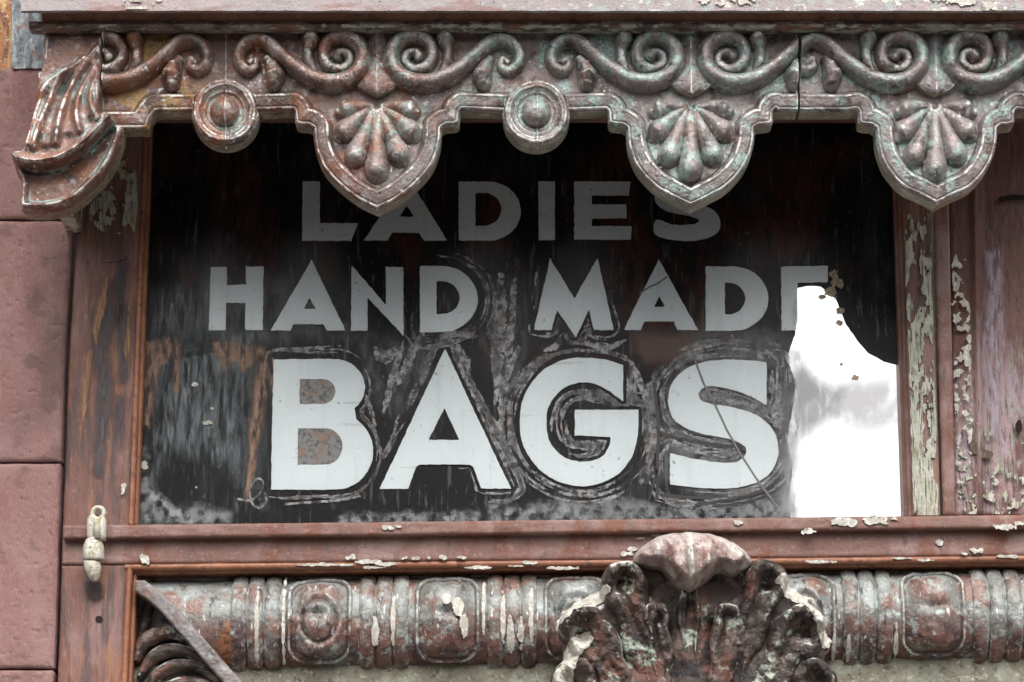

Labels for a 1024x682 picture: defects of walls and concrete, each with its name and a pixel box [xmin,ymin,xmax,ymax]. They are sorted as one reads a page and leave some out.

peeling [904,214,939,515]
peeling [951,254,1024,531]
peeling [508,561,579,570]
peeling [620,534,662,557]
peeling [831,515,898,527]
peeling [371,595,396,646]
peeling [296,554,492,639]
peeling [500,588,534,654]
peeling [557,584,611,627]
peeling [775,572,851,662]
peeling [553,631,594,682]